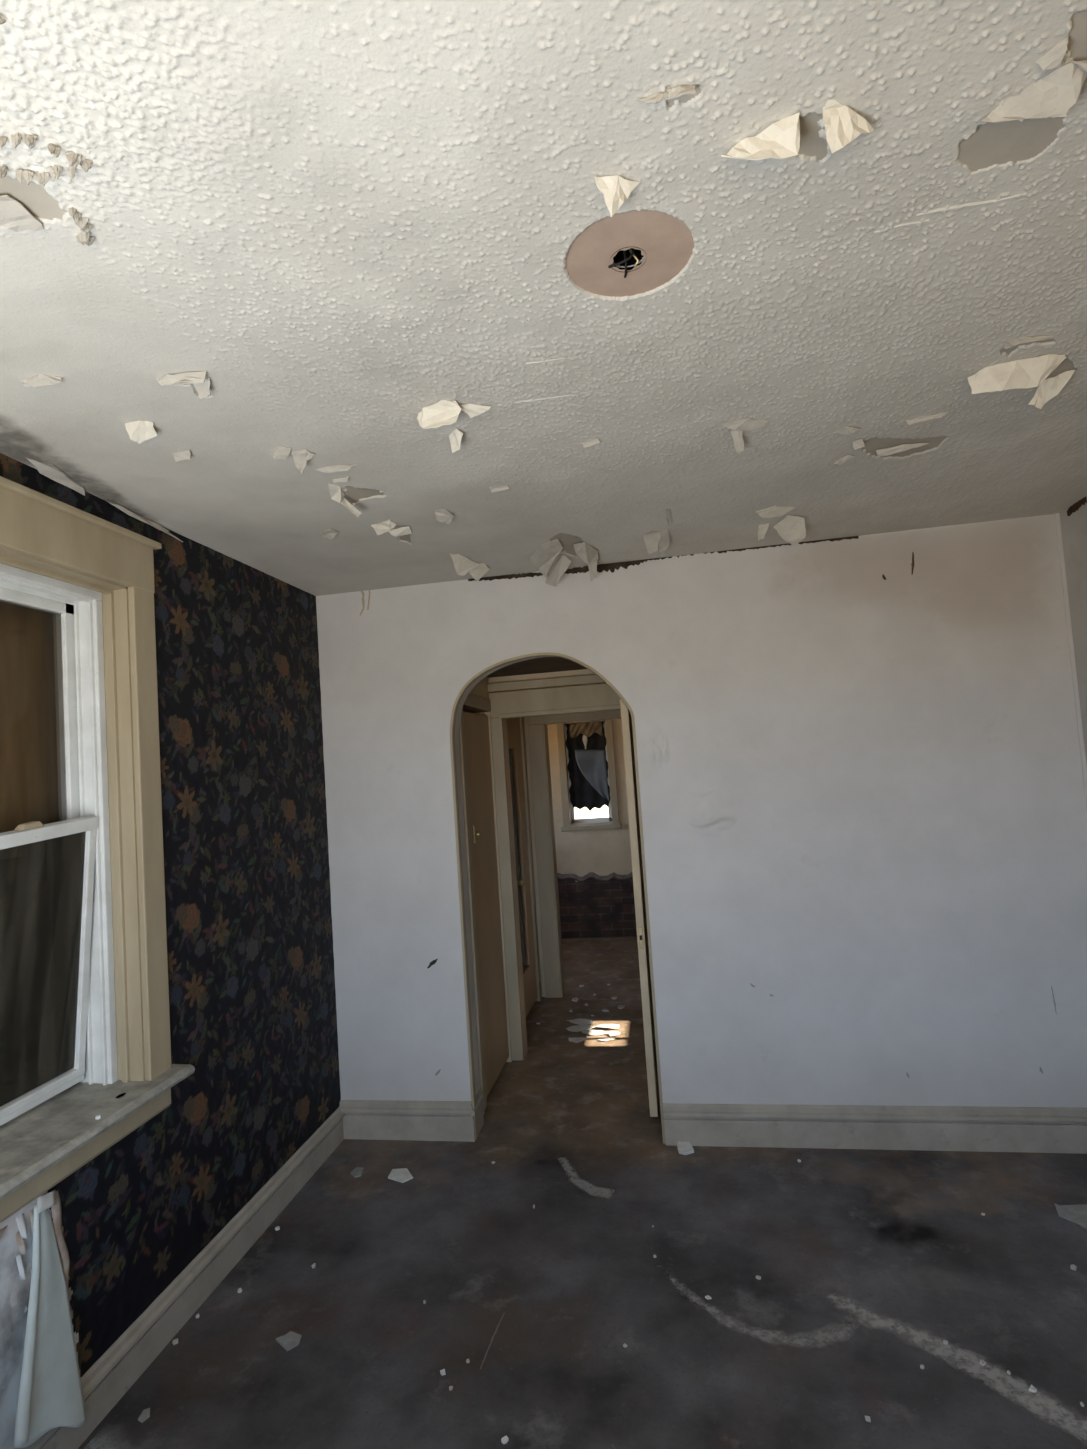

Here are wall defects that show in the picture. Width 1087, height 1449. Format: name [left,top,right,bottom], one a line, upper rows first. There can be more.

peeling [957,11,1087,172]
peeling [721,98,875,161]
peeling [0,134,95,247]
peeling [156,371,212,399]
peeling [968,334,1076,409]
peeling [125,420,158,444]
peeling [833,411,949,465]
peeling [18,449,183,542]
peeling [270,446,412,543]
peeling [528,533,600,587]
peeling [756,506,806,546]
flaking render [0,1193,63,1449]